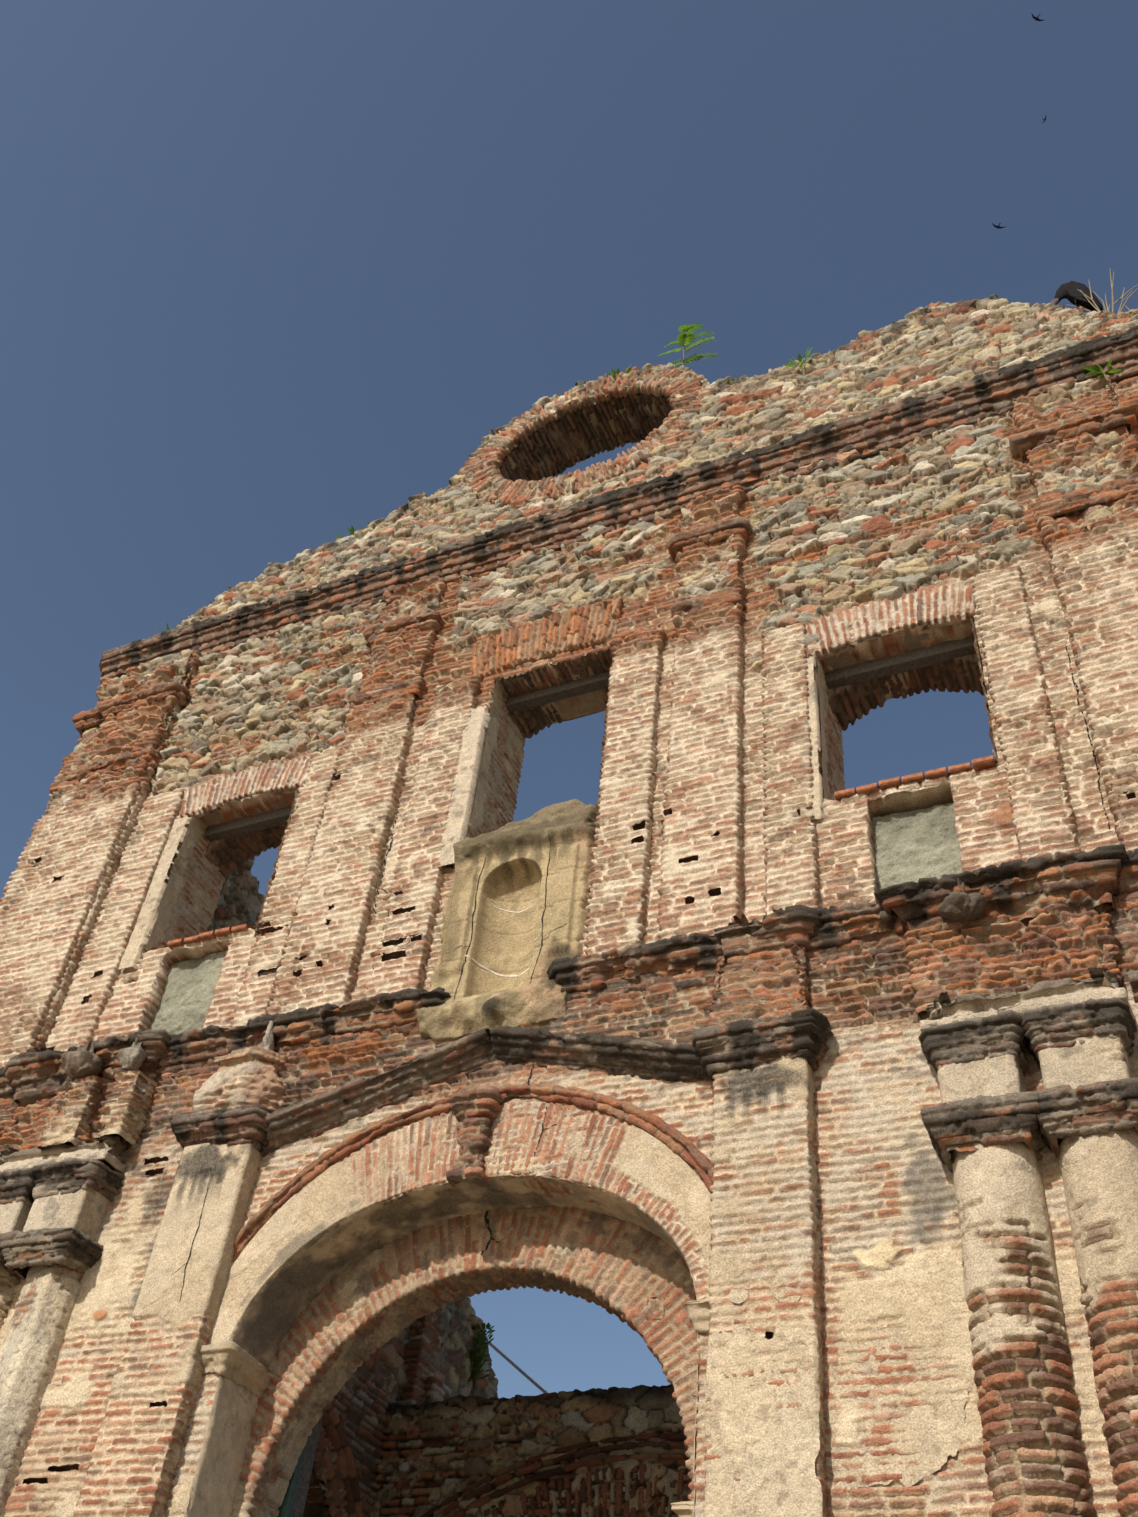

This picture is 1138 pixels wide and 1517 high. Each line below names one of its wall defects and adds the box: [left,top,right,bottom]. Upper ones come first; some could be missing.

water stain [232,1097,451,1263]
water stain [495,1084,714,1194]
water stain [240,1225,344,1367]
flaking render [729,1289,749,1304]
flaking render [773,1287,800,1302]
flaking render [704,1324,968,1517]